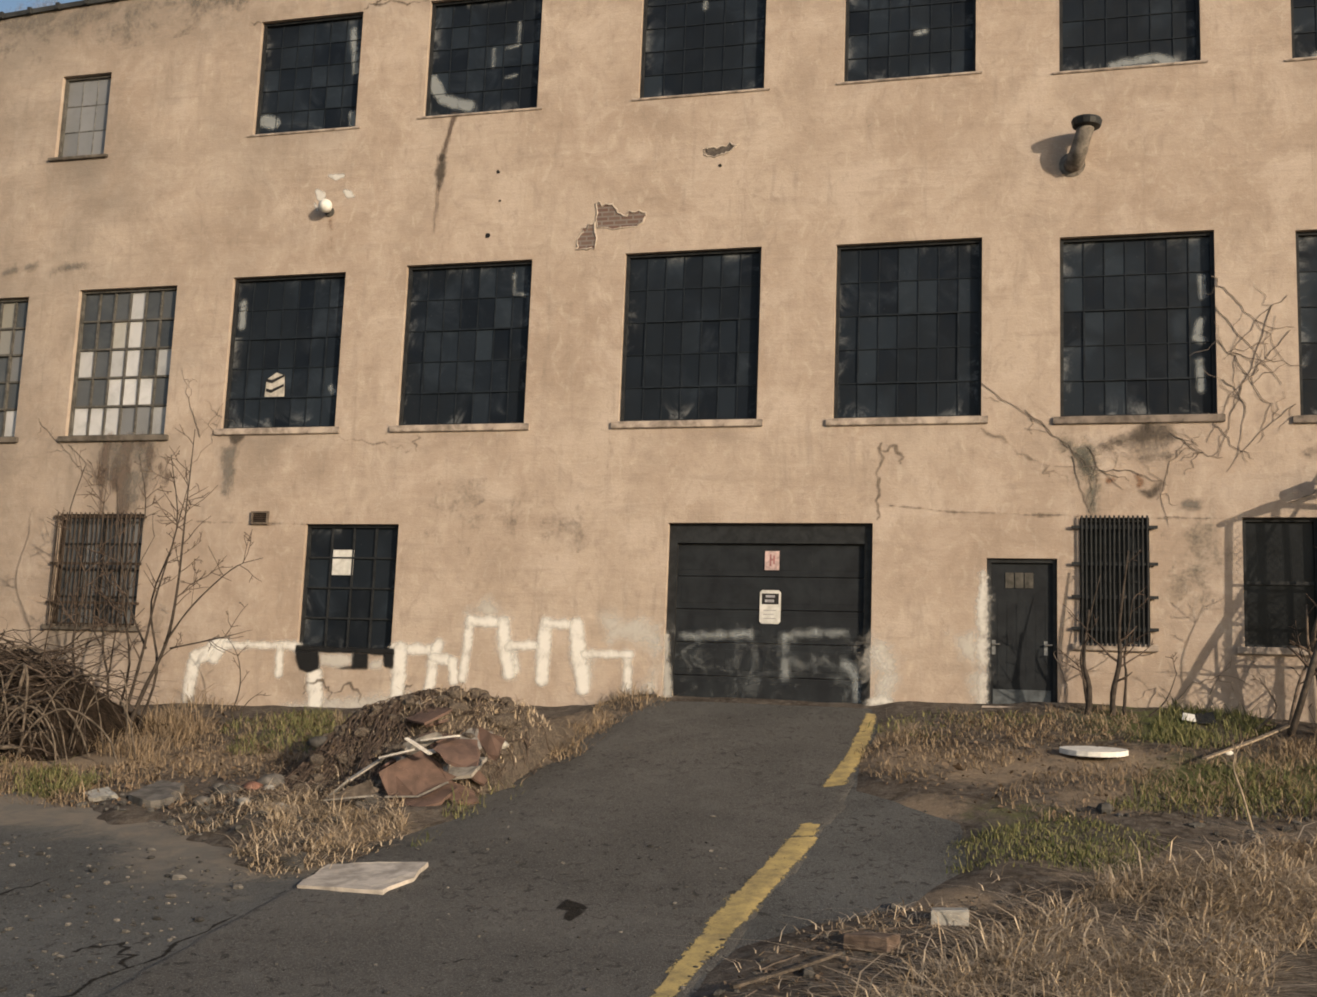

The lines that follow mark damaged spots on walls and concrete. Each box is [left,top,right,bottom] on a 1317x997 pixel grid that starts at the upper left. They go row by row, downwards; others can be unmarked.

spalling [703,141,739,167]
spalling [575,201,647,251]
water stain [98,433,170,519]
crack [877,443,902,513]
water stain [1081,423,1173,511]